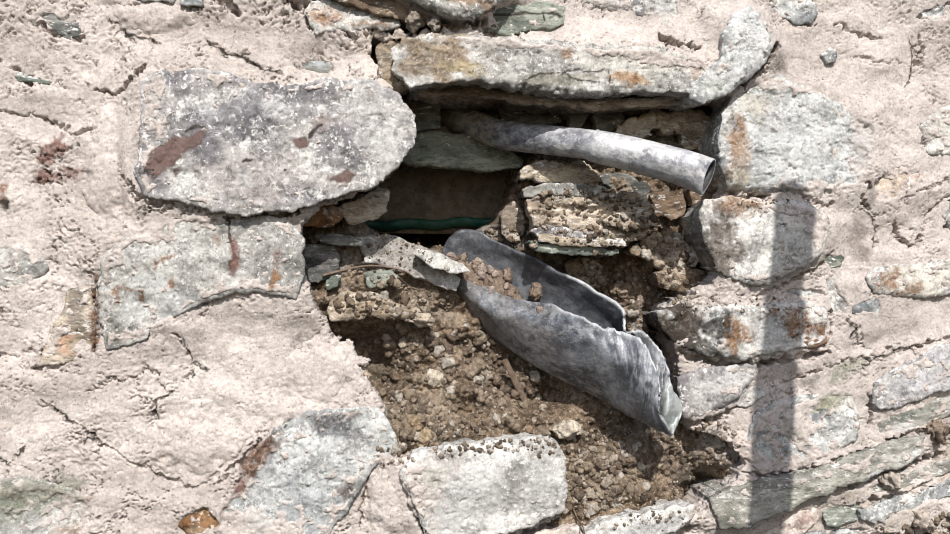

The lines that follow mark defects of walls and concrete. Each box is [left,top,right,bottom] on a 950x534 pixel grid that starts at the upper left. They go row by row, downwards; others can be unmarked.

spalling [293,137,310,148]
spalling [330,170,355,183]
rust [726,319,746,355]
rust [773,308,826,338]
crack [40,399,105,444]